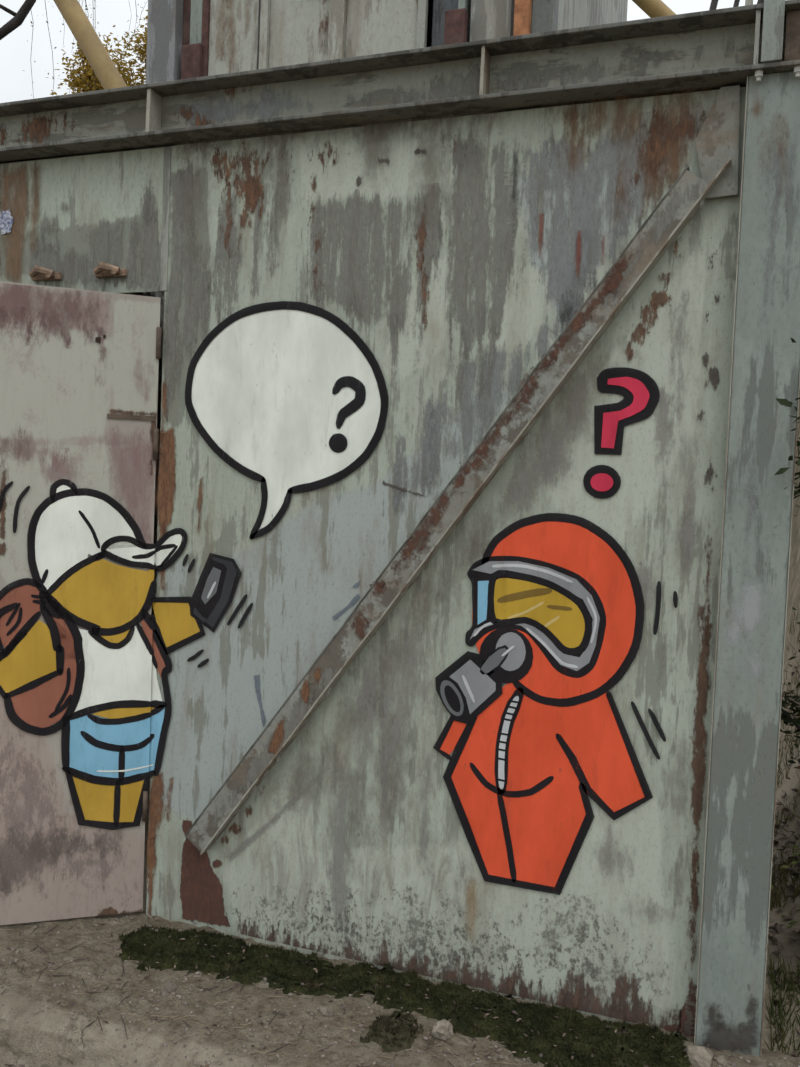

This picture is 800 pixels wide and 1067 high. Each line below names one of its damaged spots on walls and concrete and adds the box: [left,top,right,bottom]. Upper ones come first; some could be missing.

corrosion [0,112,74,145]
corrosion [210,142,269,257]
corrosion [631,104,706,185]
corrosion [626,271,671,360]
corrosion [110,383,176,539]
corrosion [394,257,630,571]
corrosion [351,612,370,639]
corrosion [687,539,712,963]
corrosion [97,773,173,916]
peeling [236,886,668,1020]